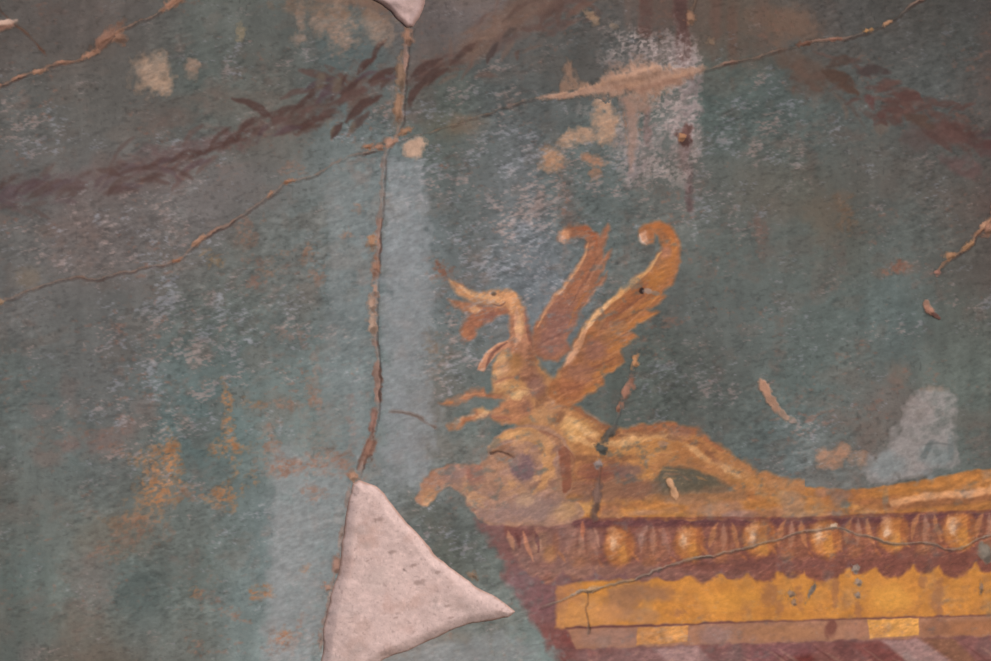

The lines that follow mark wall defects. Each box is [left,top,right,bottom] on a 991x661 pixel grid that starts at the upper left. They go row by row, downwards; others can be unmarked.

crack [0,0,185,90]
crack [682,0,698,28]
crack [704,0,927,73]
peeling [536,95,624,185]
crack [0,26,559,484]
crack [933,215,991,278]
crack [589,345,641,524]
peeling [316,524,345,652]
crack [537,521,991,637]